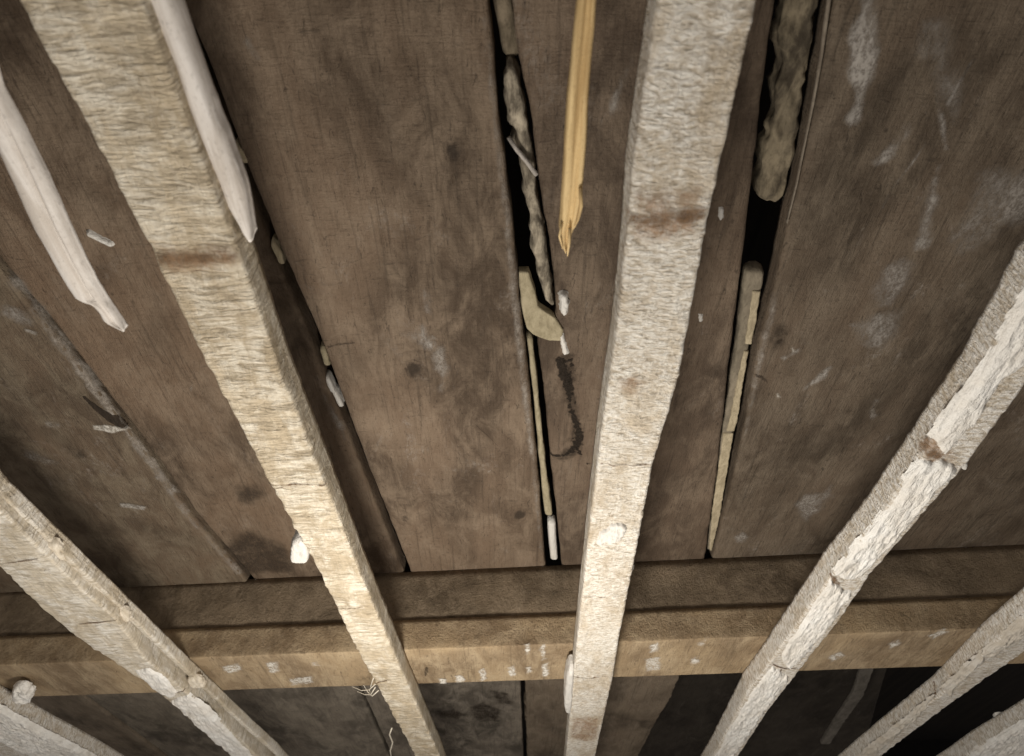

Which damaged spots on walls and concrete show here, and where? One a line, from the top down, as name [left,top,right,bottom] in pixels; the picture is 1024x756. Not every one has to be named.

rust [630,209,704,233]
rust [918,442,940,459]
peeling [715,288,1024,756]